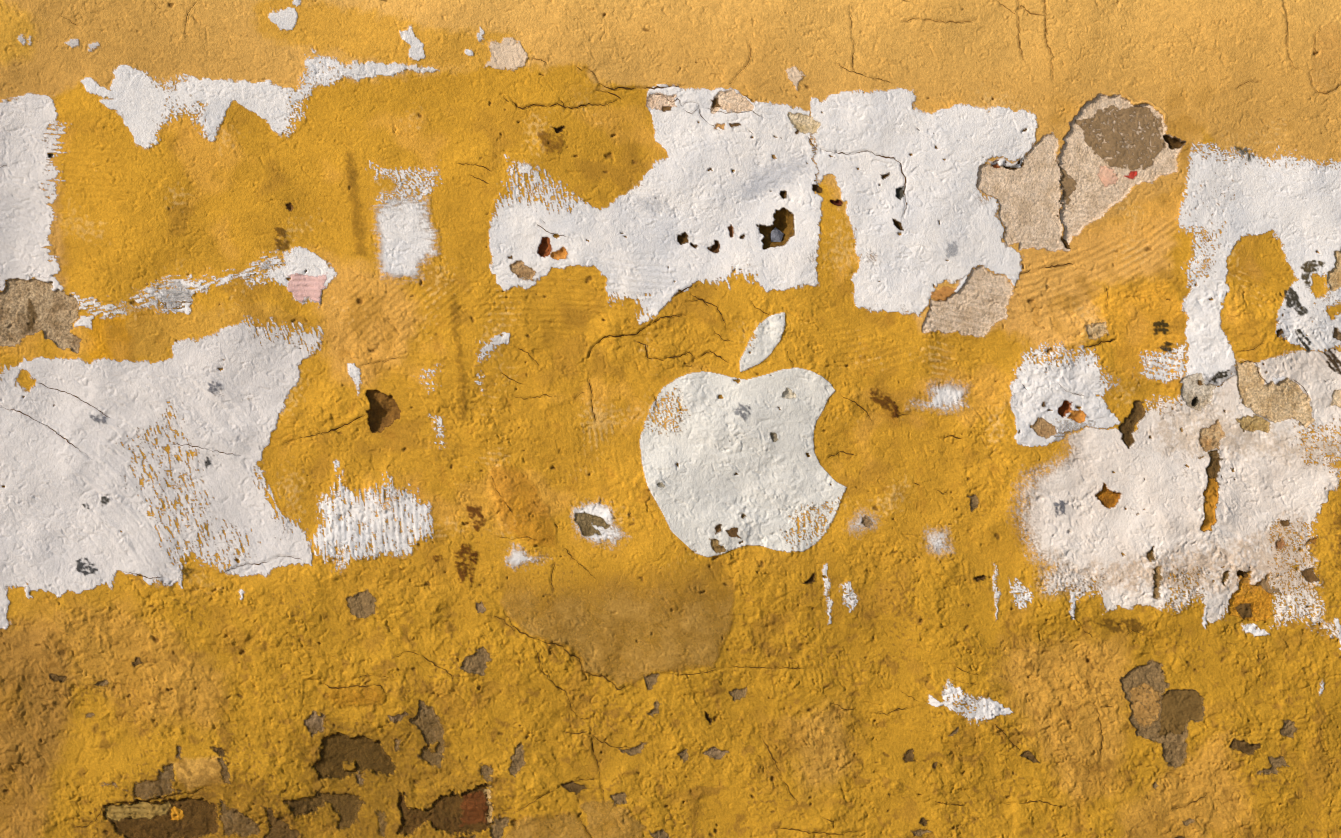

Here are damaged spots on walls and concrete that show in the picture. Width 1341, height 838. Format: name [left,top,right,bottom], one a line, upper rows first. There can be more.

flaking render [977,94,1186,252]
flaking render [677,191,795,253]
flaking render [508,237,568,281]
flaking render [0,274,82,354]
flaking render [922,266,1014,337]
peeling [1032,401,1086,439]
flaking render [1119,401,1146,449]
flaking render [1236,361,1315,433]
flaking render [1199,420,1225,532]
flaking render [1222,570,1281,622]
flaking render [1120,660,1205,768]
flaking render [101,711,509,838]